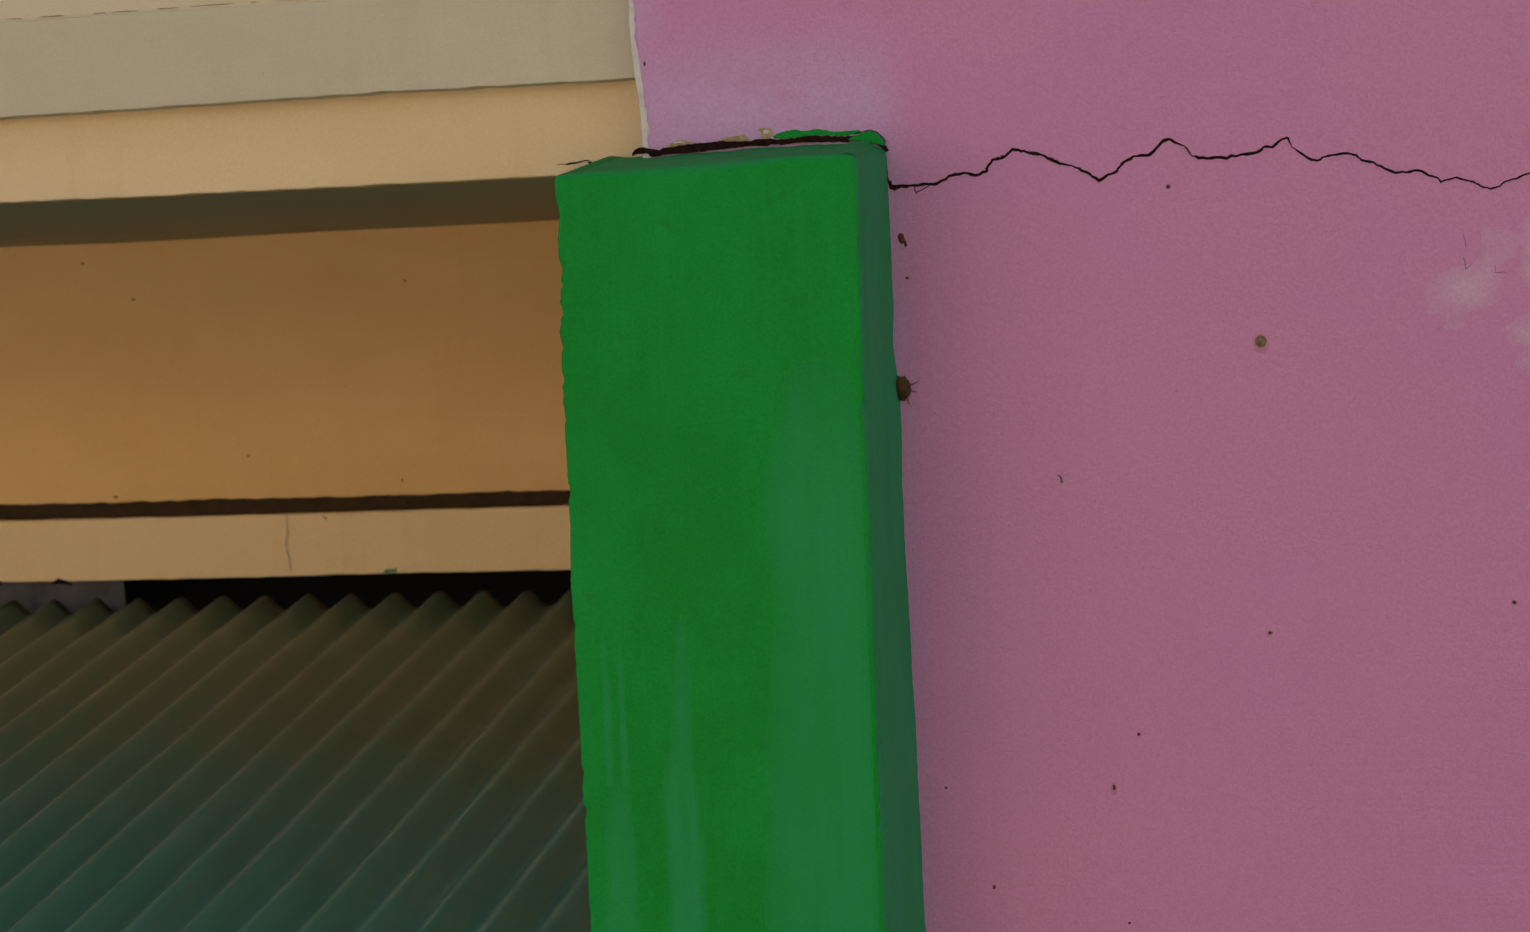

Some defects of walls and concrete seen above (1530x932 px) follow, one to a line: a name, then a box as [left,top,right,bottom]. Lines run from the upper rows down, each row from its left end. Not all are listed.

crack [557,158,592,166]
crack [632,130,1530,195]
leakage [1425,215,1530,331]